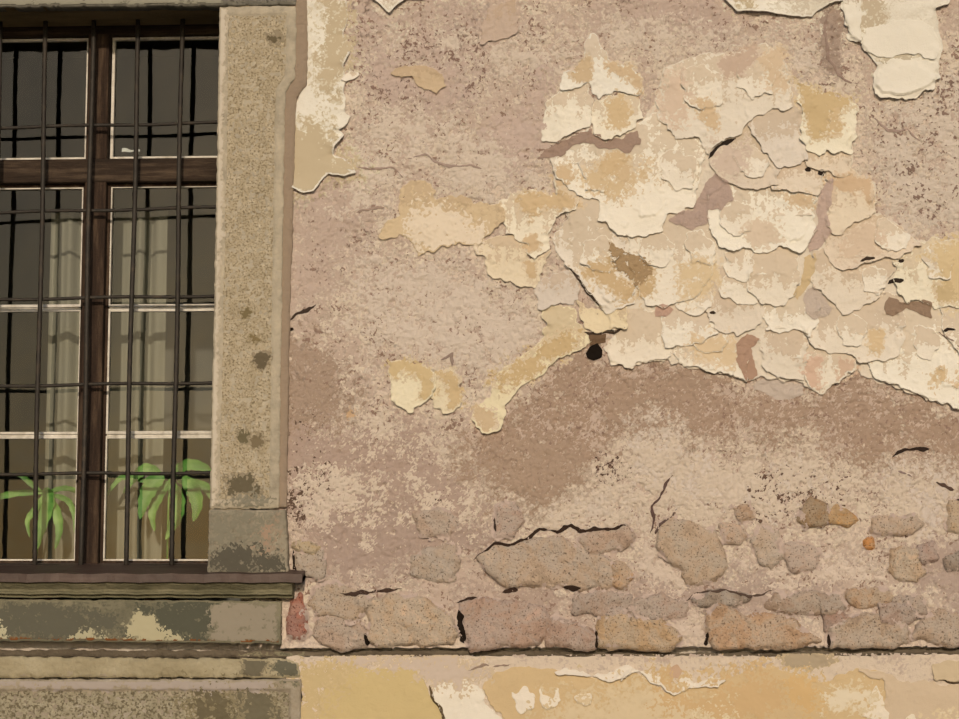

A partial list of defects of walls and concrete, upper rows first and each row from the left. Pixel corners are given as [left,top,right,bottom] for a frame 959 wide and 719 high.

peeling [290,0,959,438]
crack [650,475,676,534]
crack [474,518,626,560]
peeling [67,626,108,639]
peeling [123,608,190,641]